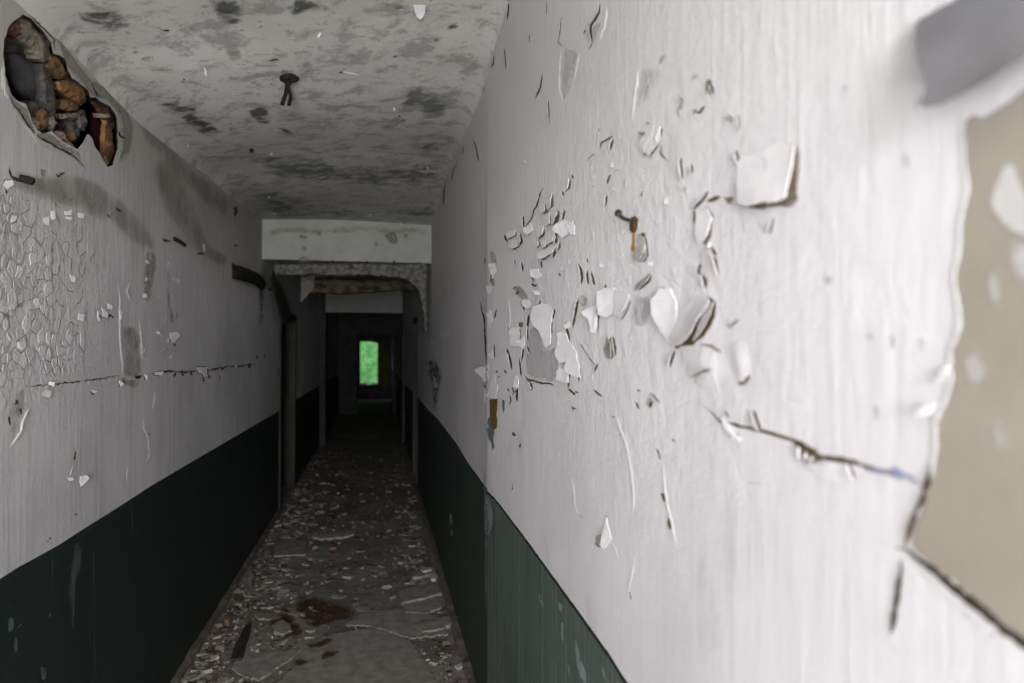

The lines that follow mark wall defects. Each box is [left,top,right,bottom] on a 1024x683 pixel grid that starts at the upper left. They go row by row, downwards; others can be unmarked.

leakage [83,12,126,27]
leakage [217,2,238,24]
leakage [293,0,316,14]
spalling [0,14,132,171]
leakage [162,103,219,133]
corrosion [629,216,638,251]
peeling [474,123,800,450]
crack [26,354,279,390]
peeling [908,91,1024,637]
peeling [656,448,678,549]
peeling [595,515,619,558]
crack [705,407,1024,655]